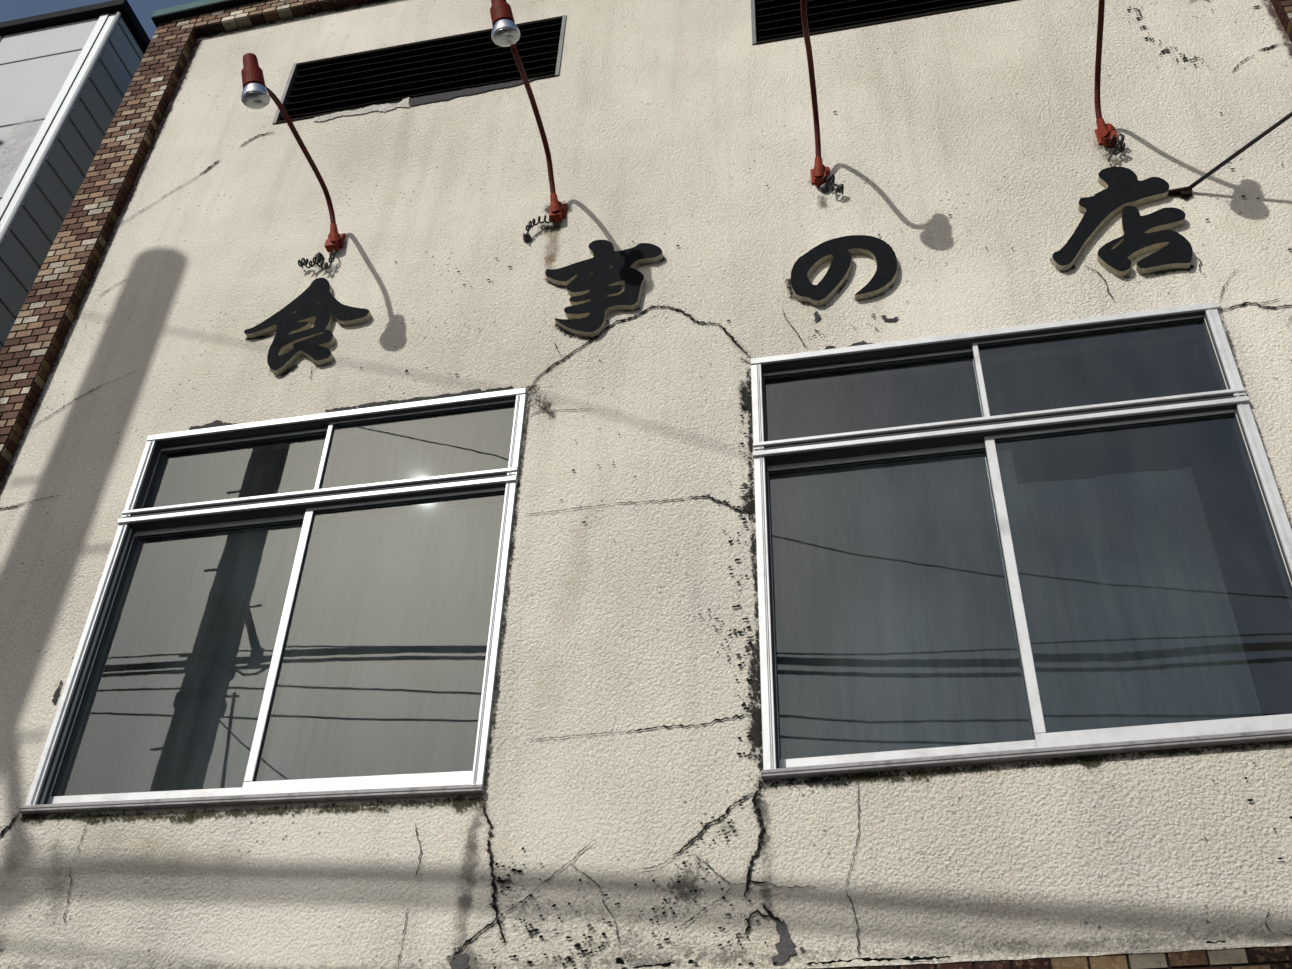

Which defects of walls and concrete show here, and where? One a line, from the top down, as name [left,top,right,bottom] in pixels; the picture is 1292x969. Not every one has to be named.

crack [1233,44,1277,72]
crack [1195,256,1292,310]
crack [526,305,751,416]
damp [1218,306,1248,396]
crack [524,494,747,515]
damp [737,368,1292,858]
damp [19,384,555,969]
crack [446,802,619,960]
crack [642,776,860,957]